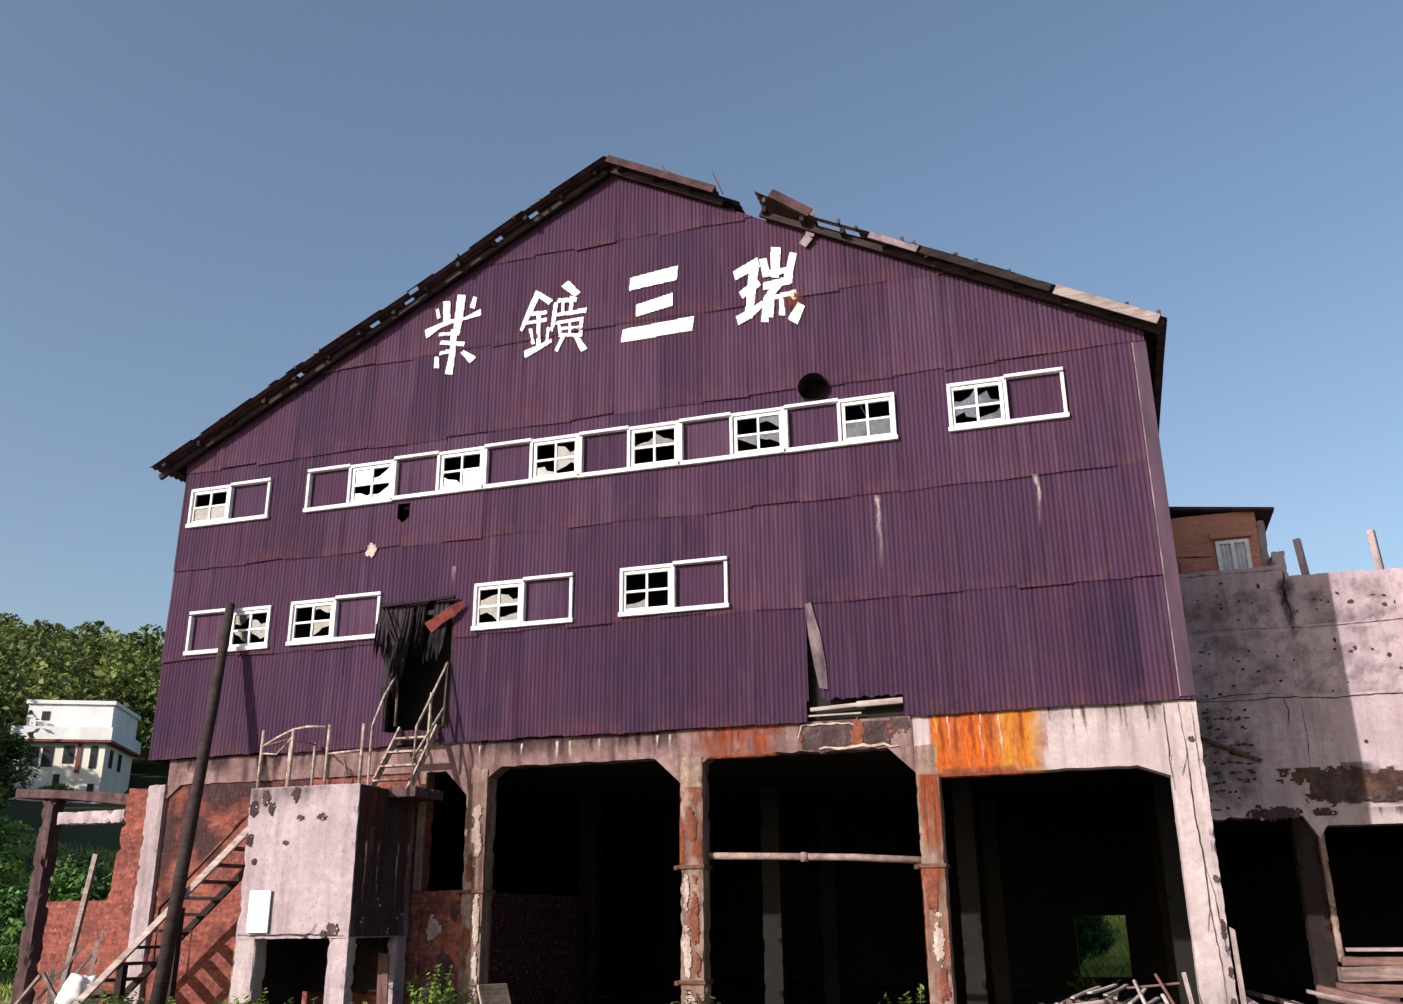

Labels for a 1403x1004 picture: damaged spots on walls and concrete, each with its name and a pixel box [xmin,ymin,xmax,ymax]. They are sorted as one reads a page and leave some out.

corrosion [680,819,702,864]
corrosion [698,724,779,758]
corrosion [919,709,1045,845]
spalling [1187,650,1403,822]